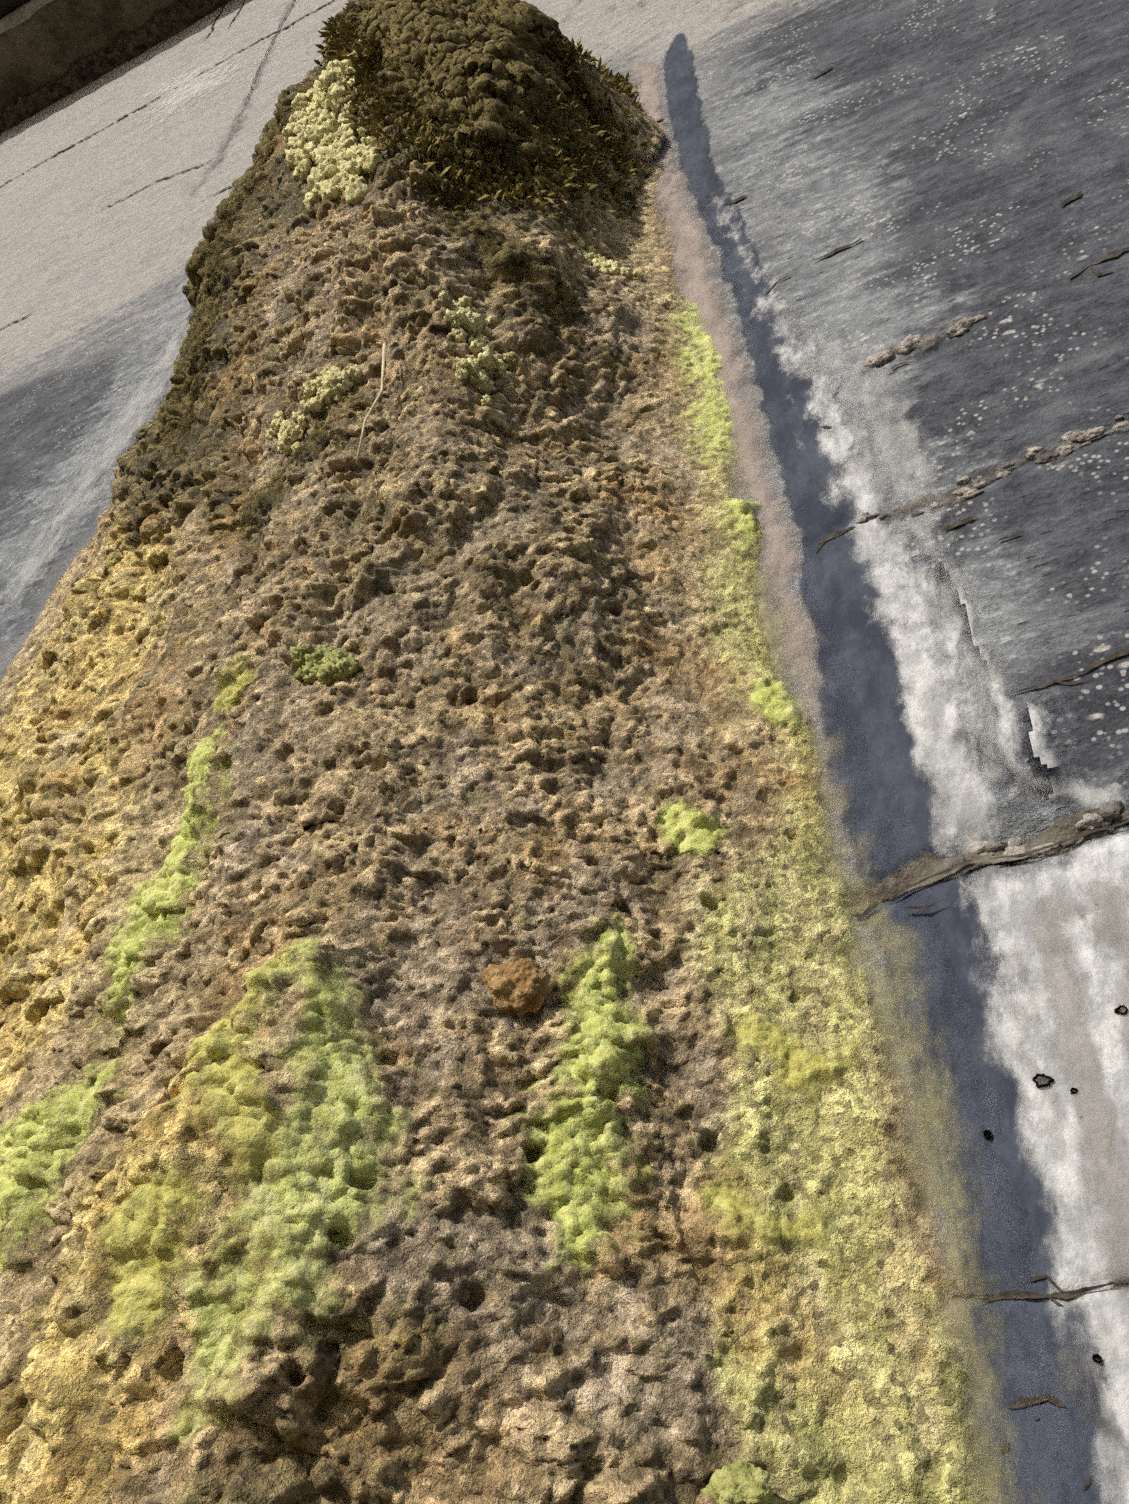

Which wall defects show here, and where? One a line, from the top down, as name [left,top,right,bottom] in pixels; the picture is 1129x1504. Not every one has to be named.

crack [0,0,334,187]
crack [100,159,231,210]
crack [816,526,854,553]
crack [942,516,1022,541]